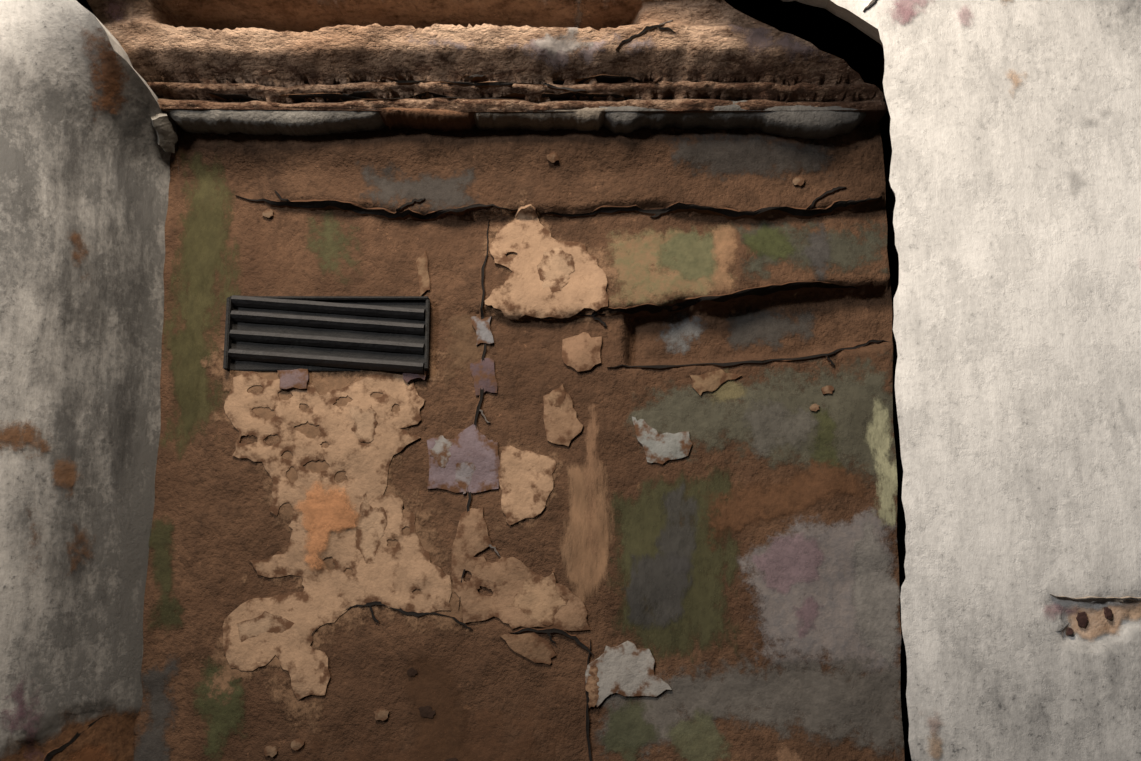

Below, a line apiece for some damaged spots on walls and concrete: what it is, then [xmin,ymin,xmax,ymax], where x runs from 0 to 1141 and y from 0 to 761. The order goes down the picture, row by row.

flaking render [470,192,619,396]
crack [236,186,881,361]
crack [607,339,888,370]
crack [473,388,490,430]
flaking render [632,417,692,465]
crack [465,492,473,512]
flaking render [201,347,590,732]
flaking render [1045,602,1141,639]
crack [509,627,594,761]
flaking render [585,641,672,708]
flaking render [0,708,138,761]